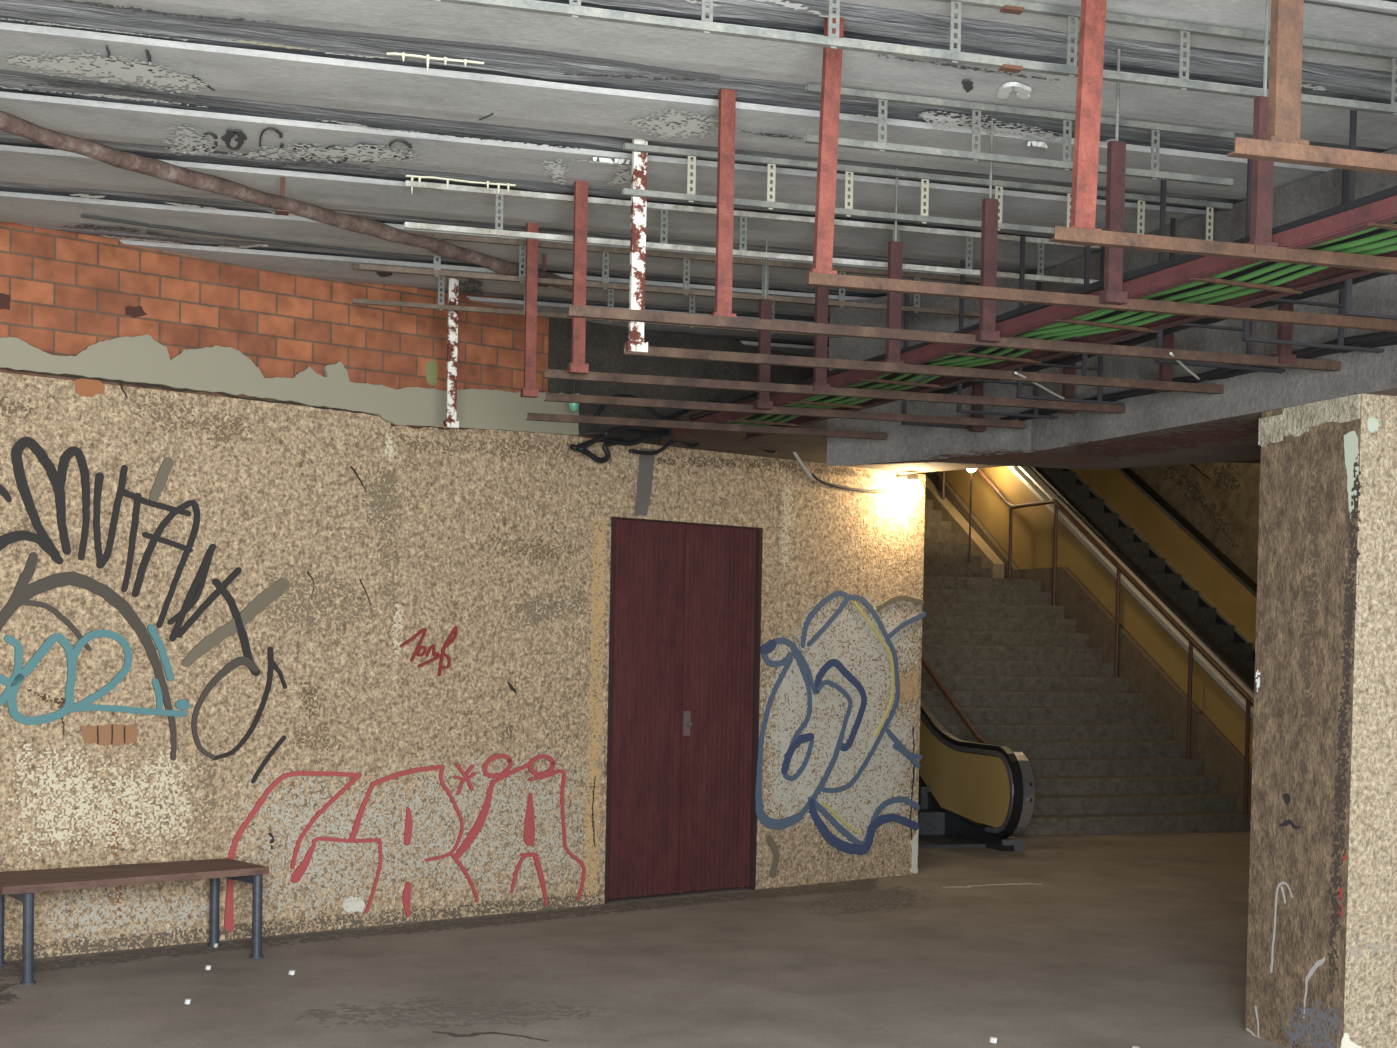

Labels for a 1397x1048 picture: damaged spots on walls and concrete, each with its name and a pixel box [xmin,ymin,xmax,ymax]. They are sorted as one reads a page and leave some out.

crack [1304,0,1397,17]
flaking render [0,221,580,435]
spalling [1340,1033,1362,1048]